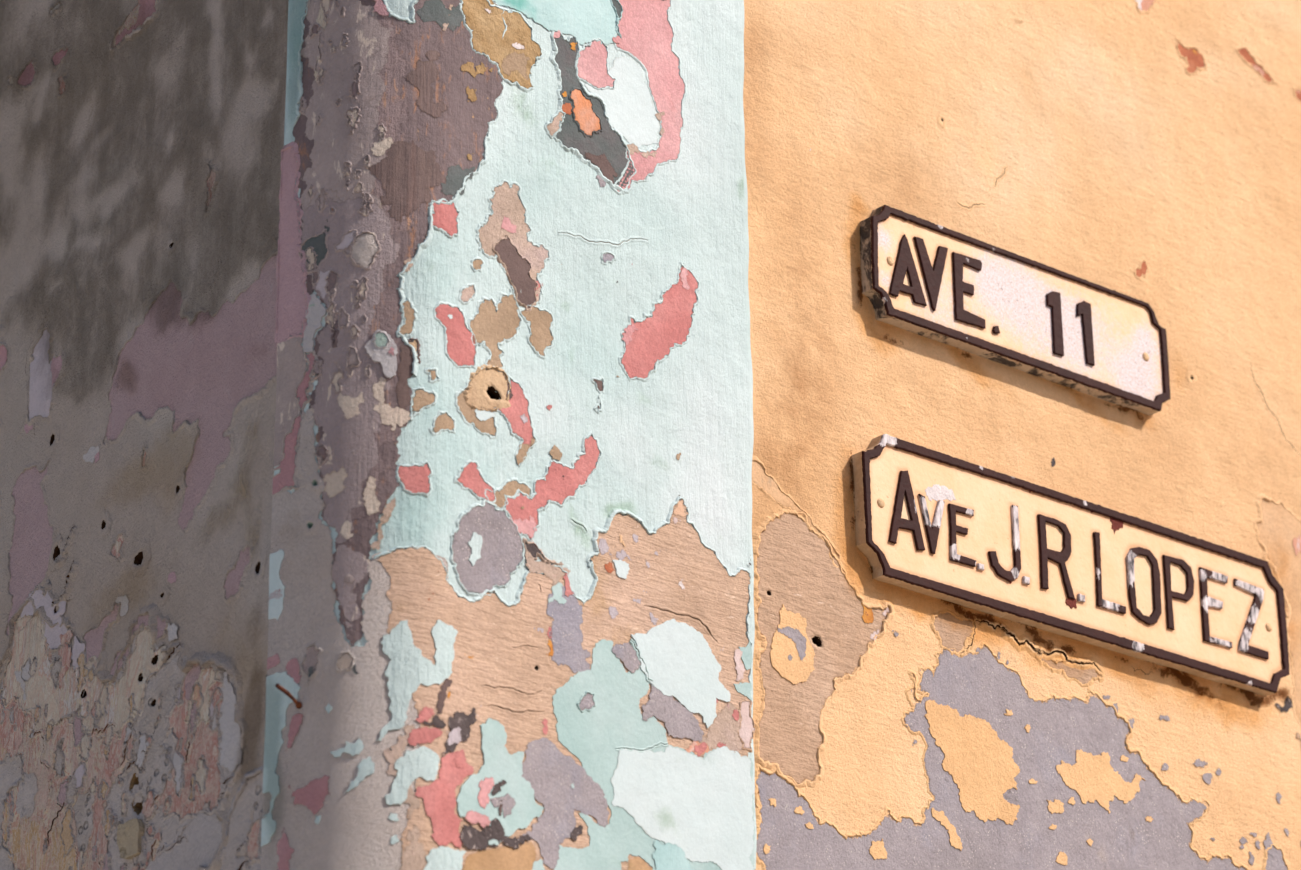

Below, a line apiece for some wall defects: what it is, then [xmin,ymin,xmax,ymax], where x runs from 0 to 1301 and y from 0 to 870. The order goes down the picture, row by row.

peeling [544,0,687,195]
peeling [618,262,700,382]
flaking render [0,0,611,870]
flaking render [552,456,1249,870]
crack [957,615,1154,678]
flaking render [1252,493,1301,739]
flaking render [1249,832,1291,870]